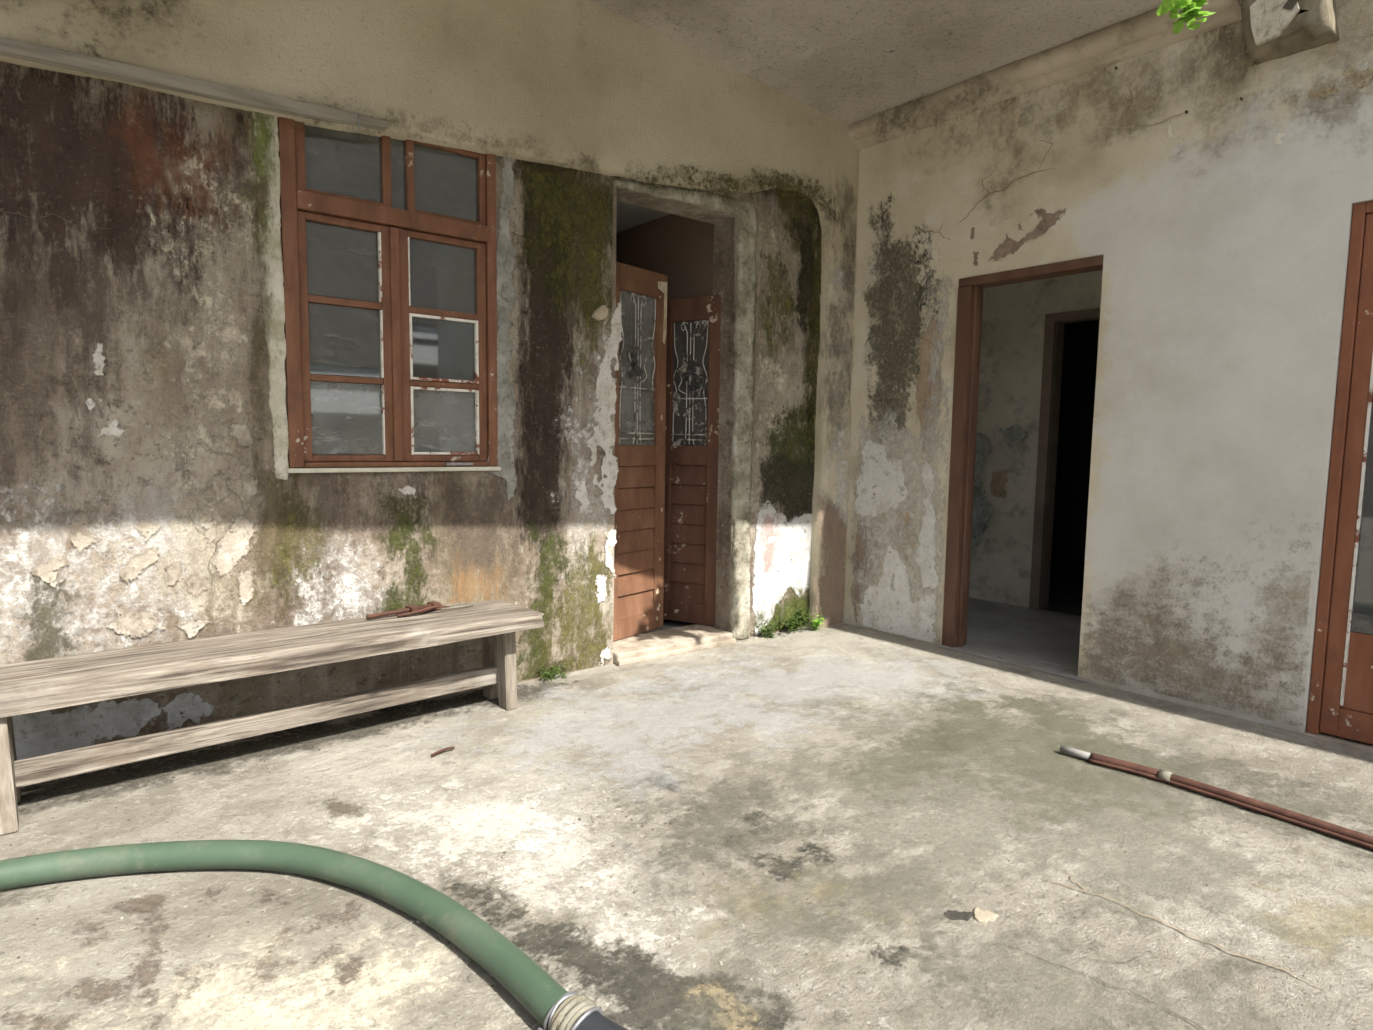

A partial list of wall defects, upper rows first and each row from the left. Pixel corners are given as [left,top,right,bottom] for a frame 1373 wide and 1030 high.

crack [915,140,1054,240]
peeling [970,208,1066,266]
damp [0,65,393,661]
damp [485,141,612,579]
peeling [575,303,623,603]
damp [629,166,953,643]
peeling [854,316,943,643]
flaking render [971,425,1027,549]
flaking render [752,500,812,636]
peeling [597,647,611,666]
damp [1087,575,1309,719]